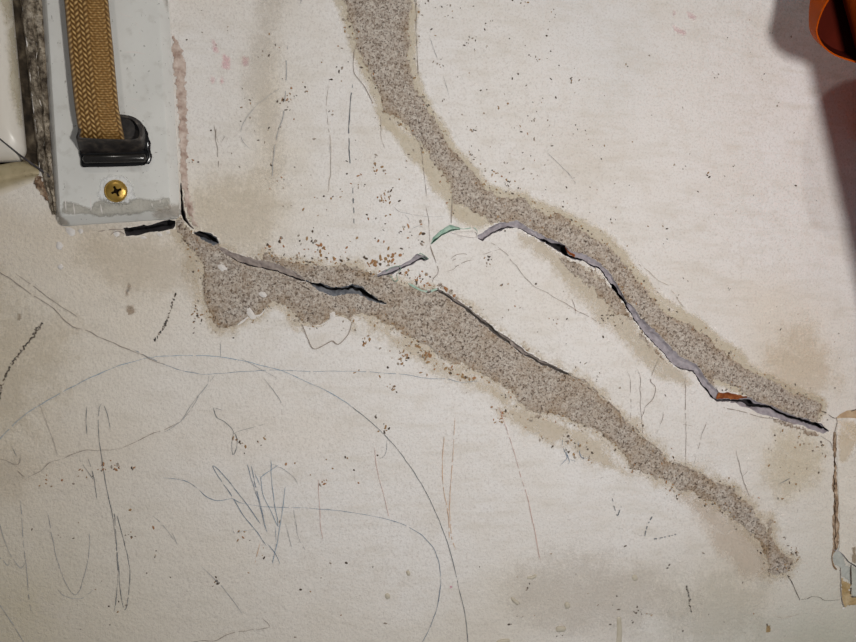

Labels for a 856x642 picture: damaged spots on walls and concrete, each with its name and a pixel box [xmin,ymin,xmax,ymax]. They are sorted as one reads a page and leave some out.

spalling [143,125,152,164]
spalling [157,0,828,578]
crack [194,144,856,554]
spalling [832,547,856,609]